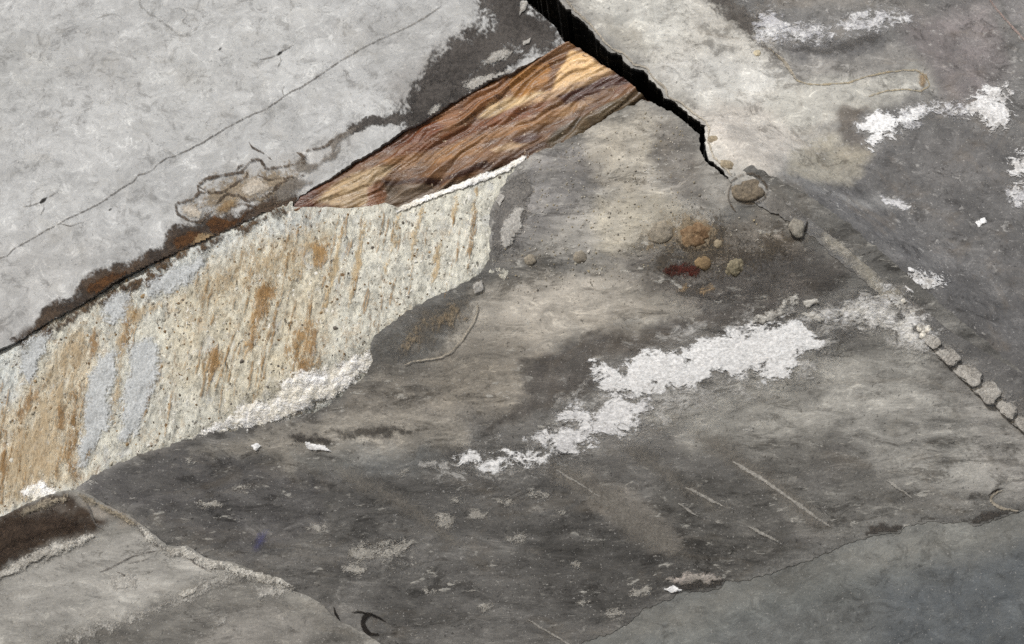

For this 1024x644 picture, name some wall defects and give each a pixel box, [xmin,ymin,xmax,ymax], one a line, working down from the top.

leakage [708,0,913,59]
crack [0,7,439,259]
crack [638,80,677,116]
crack [697,137,705,157]
leakage [854,81,1015,152]
leakage [881,196,911,210]
leakage [1006,148,1024,207]
rust [0,187,478,504]
spalling [0,158,534,516]
leakage [395,216,951,478]
leakage [342,539,417,578]
leakage [629,585,652,597]